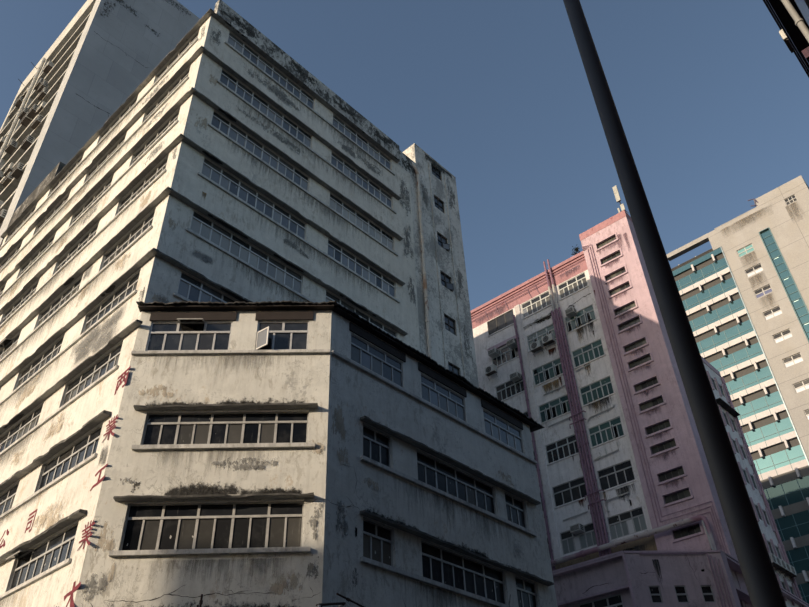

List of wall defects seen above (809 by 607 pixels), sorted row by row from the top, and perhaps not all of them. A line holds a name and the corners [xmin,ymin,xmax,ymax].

leakage [223,11,259,40]
leakage [291,60,317,85]
leakage [76,310,121,360]
peeling [212,457,277,471]
crack [81,589,273,607]